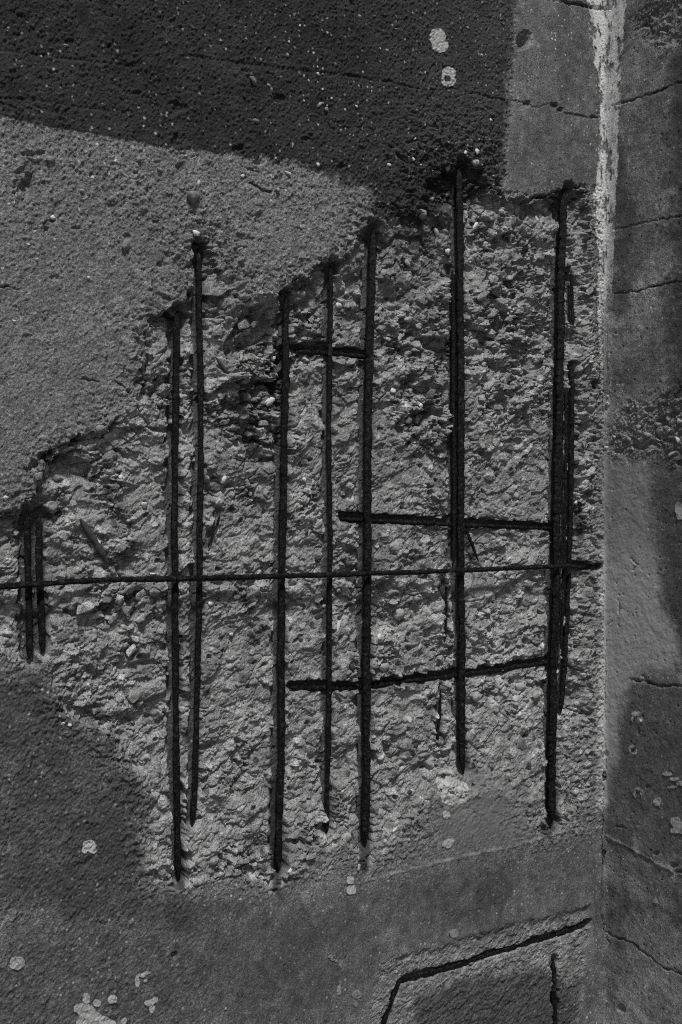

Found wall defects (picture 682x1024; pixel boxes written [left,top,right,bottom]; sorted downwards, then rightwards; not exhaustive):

crack [616,82,681,105]
spalling [0,155,603,895]